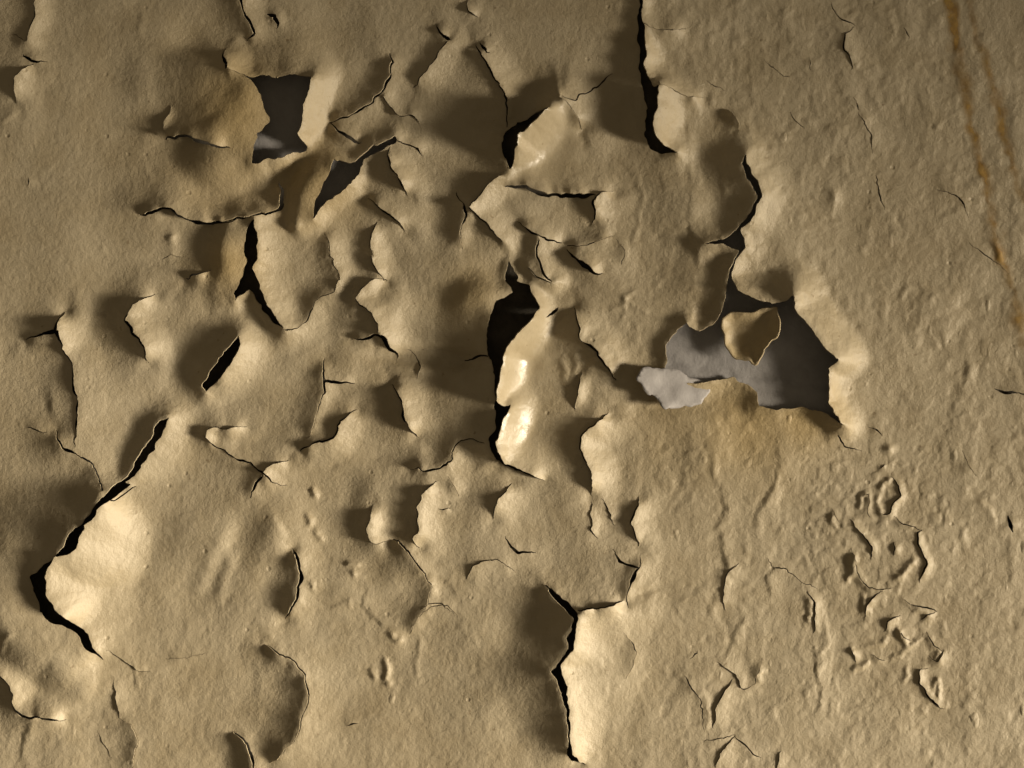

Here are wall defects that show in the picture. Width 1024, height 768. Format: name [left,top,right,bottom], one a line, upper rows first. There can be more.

peeling [0,0,602,736]
peeling [636,0,880,423]
rust [944,0,960,51]